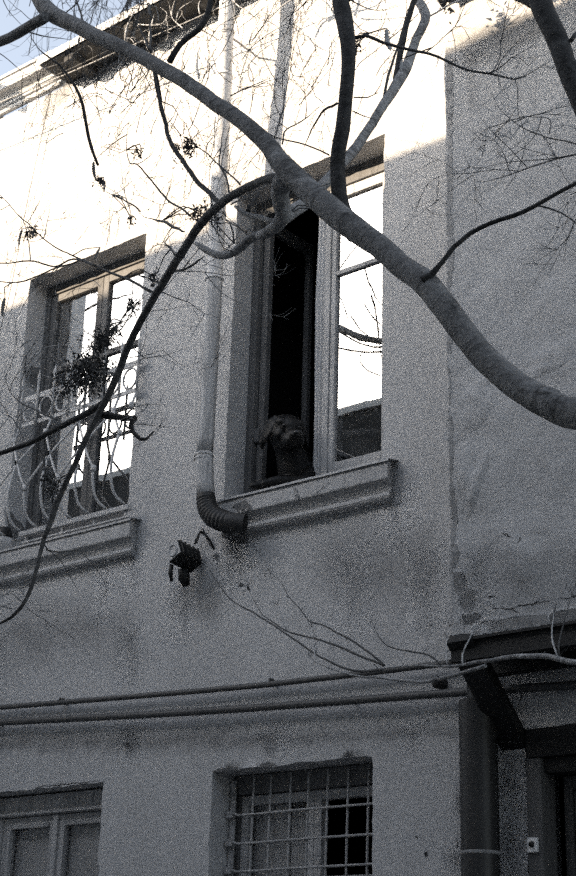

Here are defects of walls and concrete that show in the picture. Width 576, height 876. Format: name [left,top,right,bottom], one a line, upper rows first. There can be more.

flaking render [445,46,454,292]
flaking render [447,366,576,636]
crack [488,592,576,613]